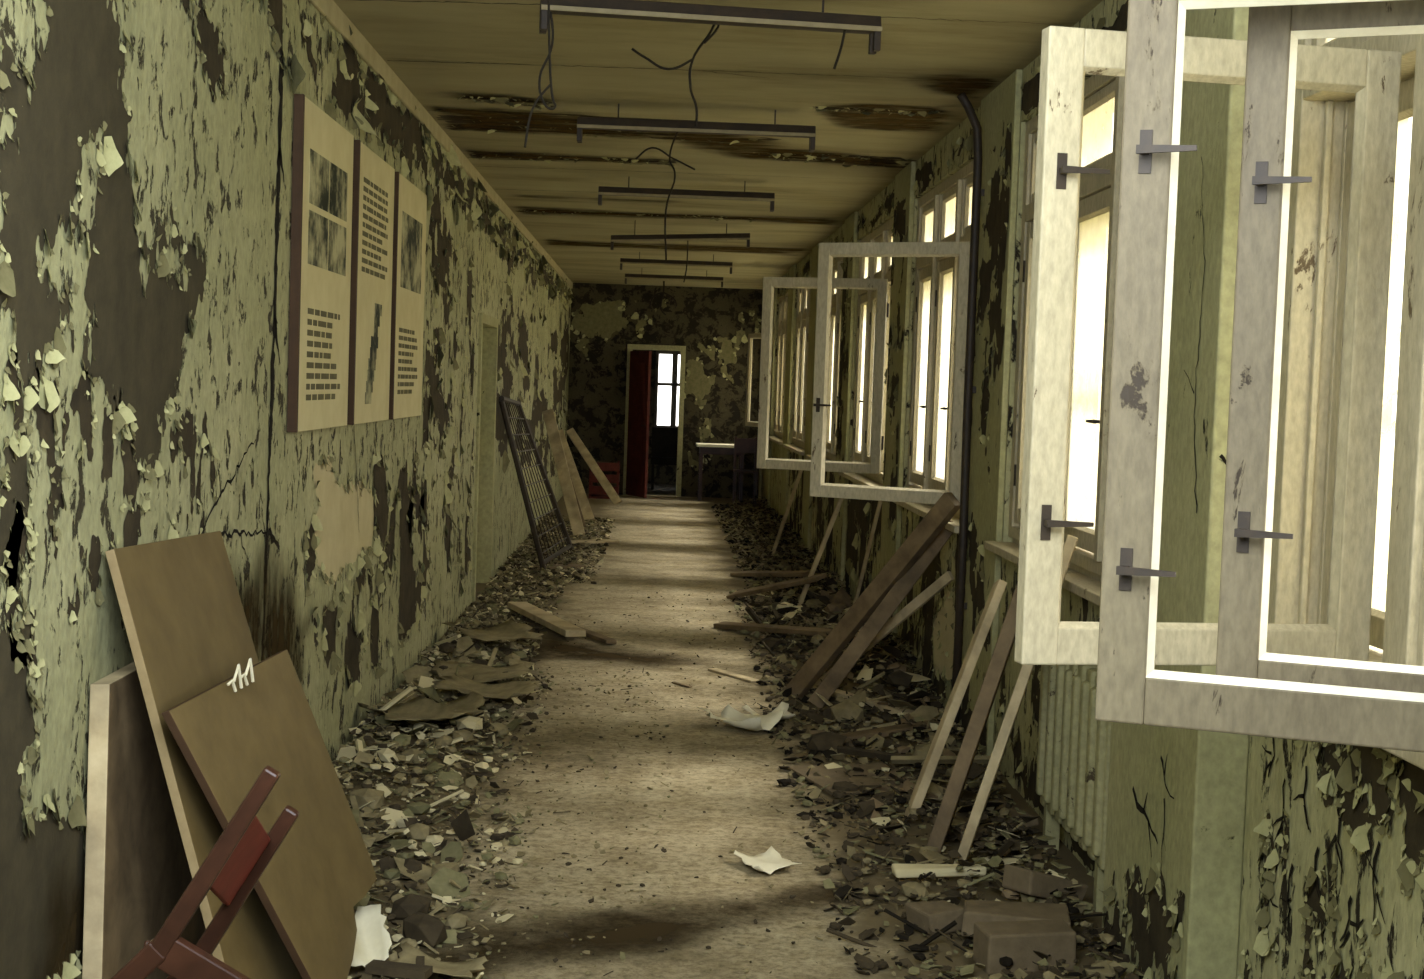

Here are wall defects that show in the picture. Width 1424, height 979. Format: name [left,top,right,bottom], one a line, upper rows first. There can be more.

peeling [182,0,230,103]
peeling [1096,0,1128,32]
peeling [246,0,695,697]
peeling [683,310,762,471]
peeling [708,66,1040,599]
peeling [0,0,222,979]
peeling [1237,809,1289,979]
peeling [1274,740,1424,900]
peeling [1297,858,1406,979]